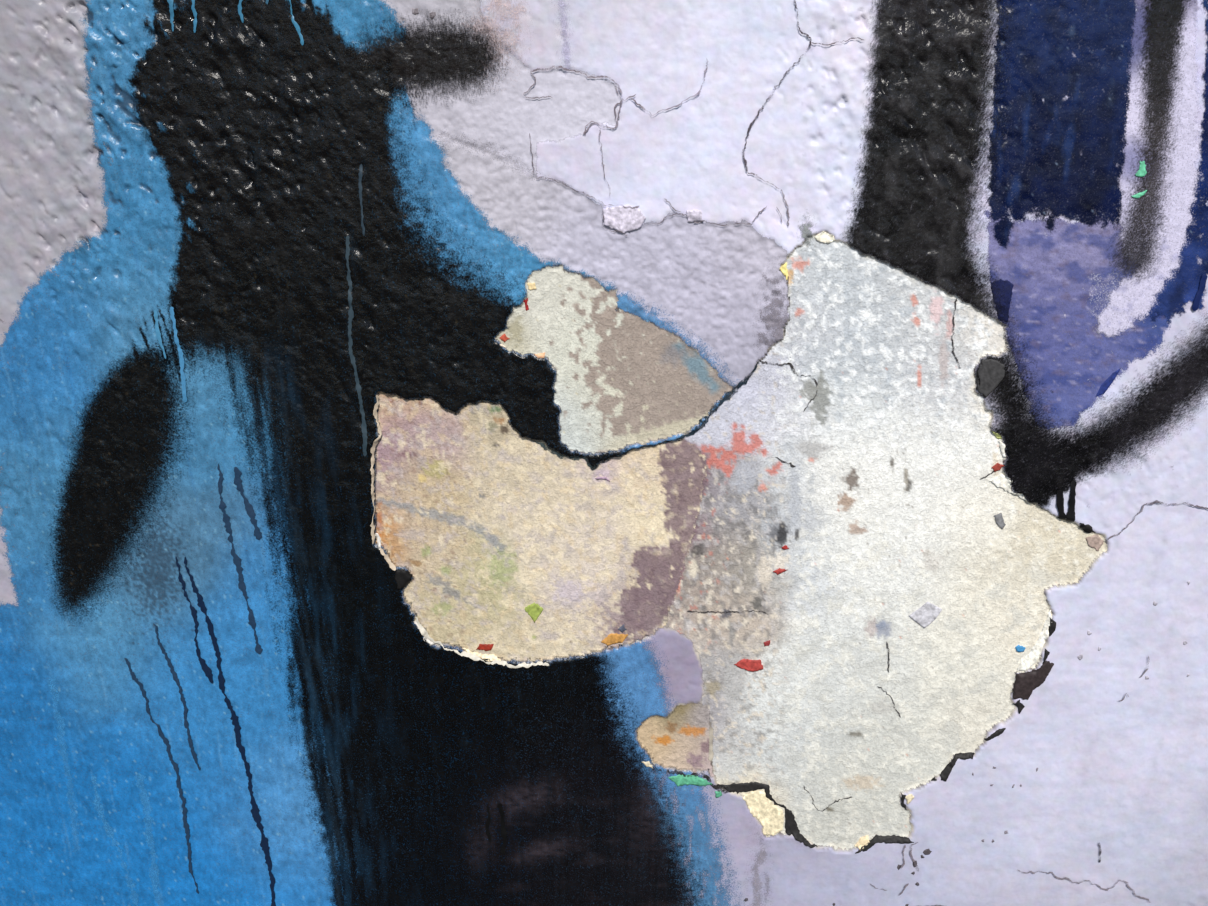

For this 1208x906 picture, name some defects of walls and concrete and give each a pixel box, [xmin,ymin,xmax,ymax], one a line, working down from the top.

crack [524,1,864,236]
peeling [370,0,1108,854]
crack [1108,500,1208,540]
crack [870,842,942,906]
crack [1018,844,1151,903]